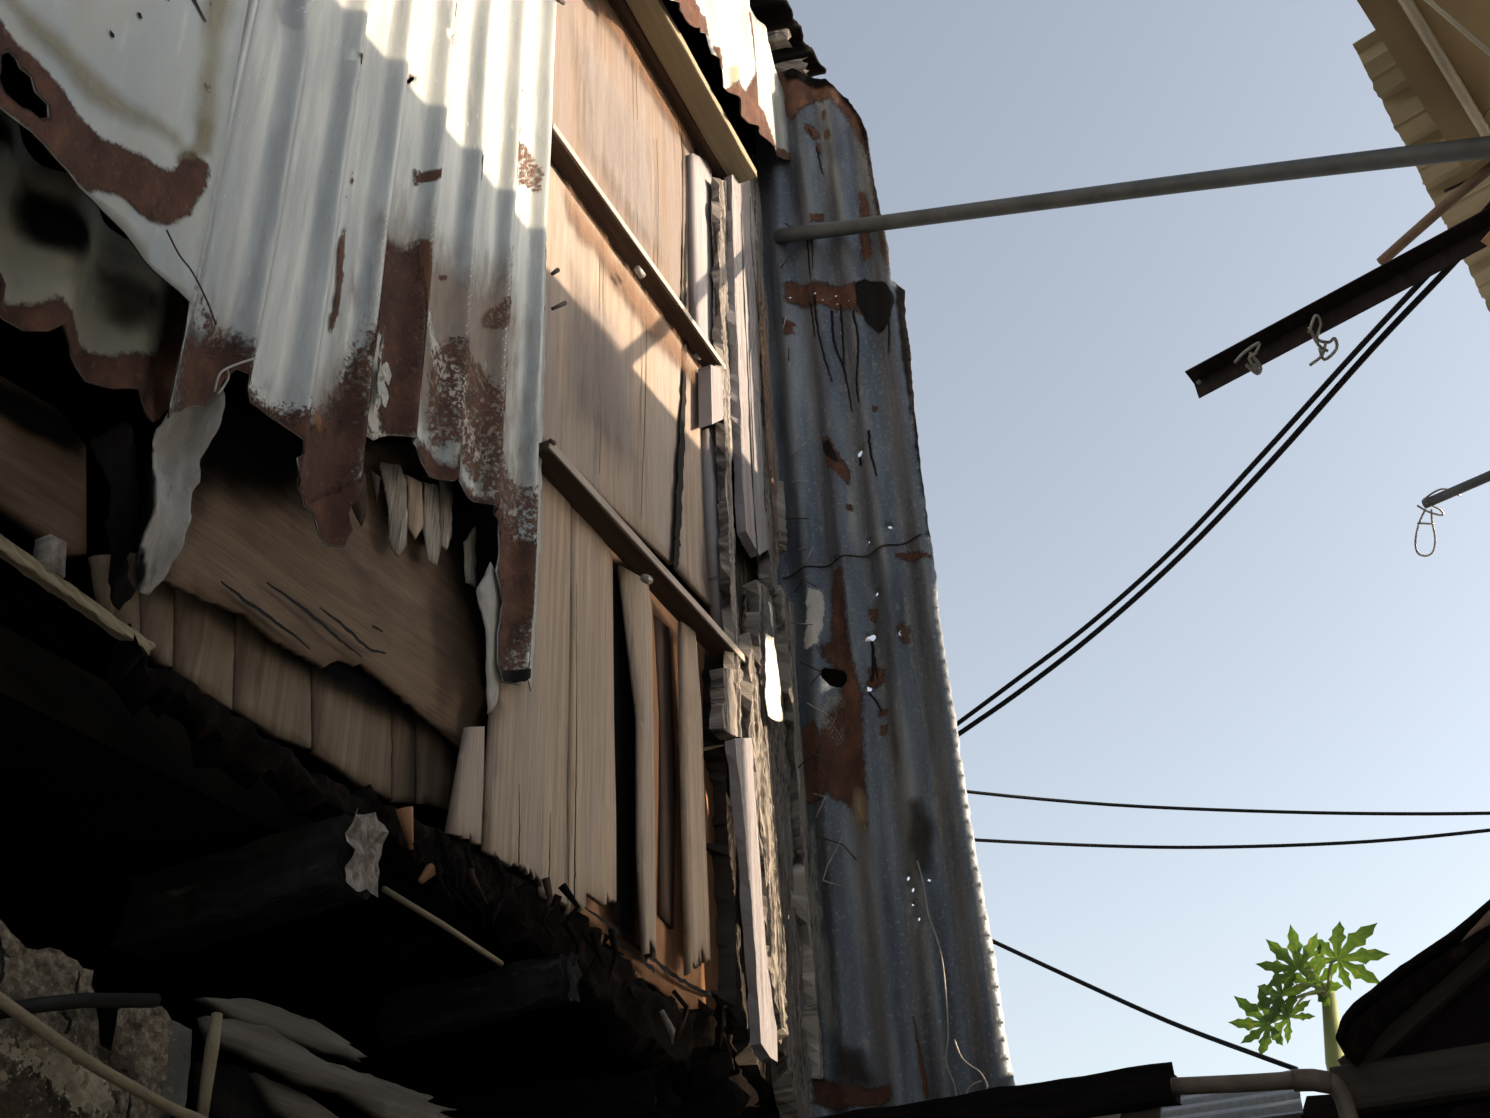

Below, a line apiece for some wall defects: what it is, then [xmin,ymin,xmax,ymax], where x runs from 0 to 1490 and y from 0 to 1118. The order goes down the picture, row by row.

corrosion [0,19,211,225]
corrosion [412,168,442,186]
corrosion [518,129,545,191]
corrosion [675,0,791,160]
corrosion [776,70,894,412]
corrosion [0,228,539,683]
corrosion [822,436,851,485]
corrosion [895,551,933,563]
corrosion [802,555,889,826]